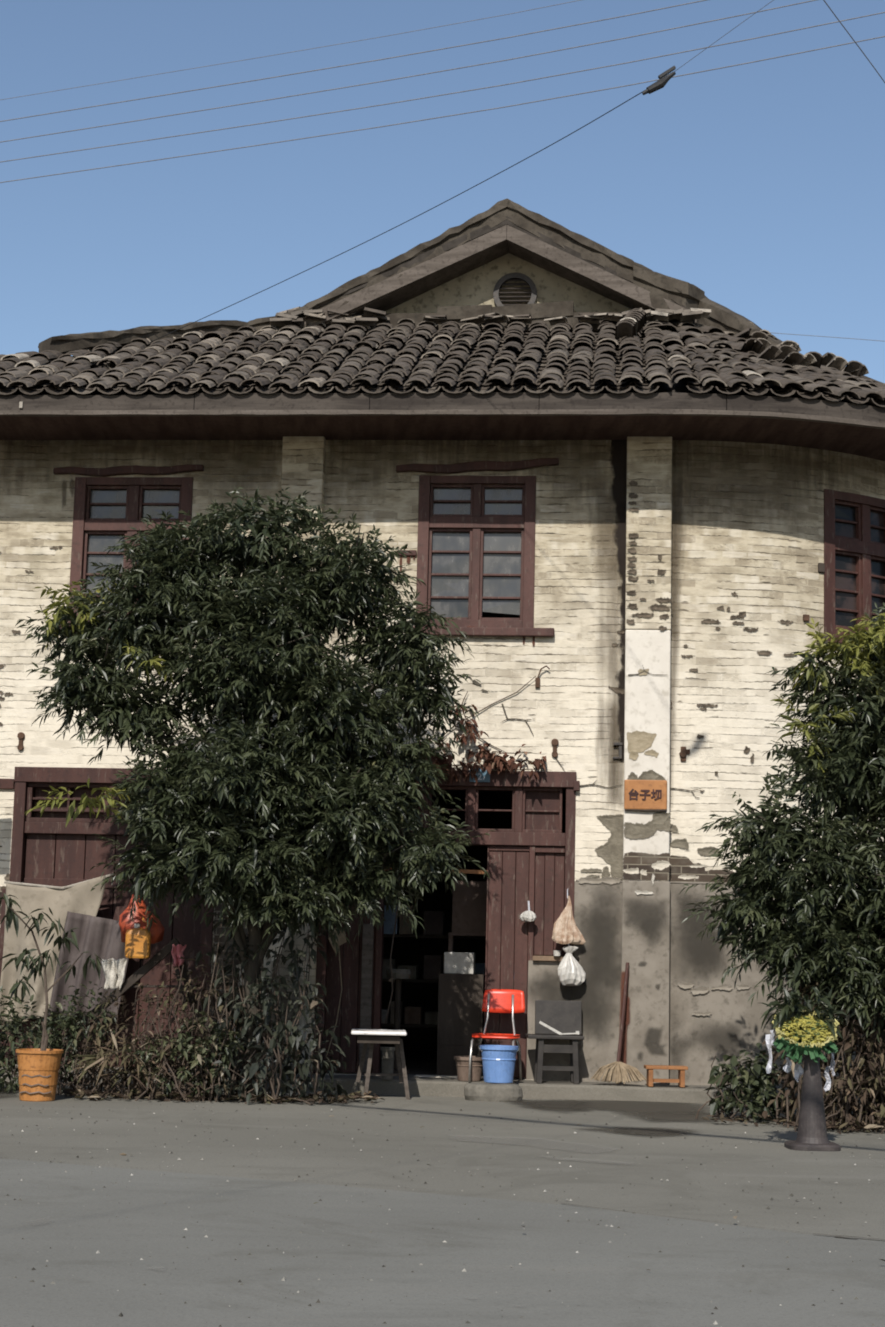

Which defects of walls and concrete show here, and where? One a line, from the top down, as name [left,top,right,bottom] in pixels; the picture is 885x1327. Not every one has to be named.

spalling [701,592,758,632]
peeling [627,731,665,780]
spalling [578,812,734,895]
water stain [628,902,663,938]
water stain [681,898,719,968]
water stain [541,897,612,1034]
water stain [639,1028,664,1058]